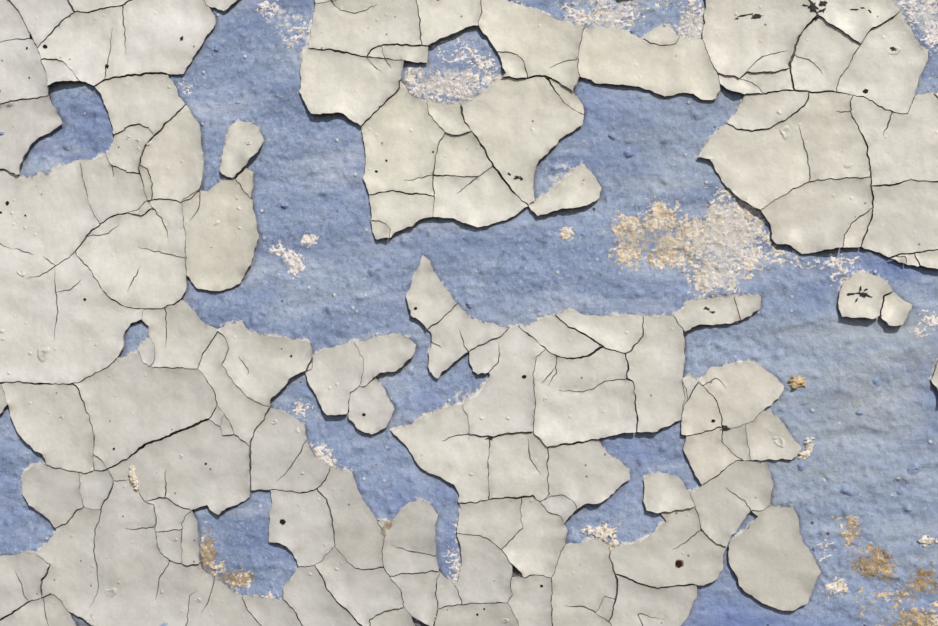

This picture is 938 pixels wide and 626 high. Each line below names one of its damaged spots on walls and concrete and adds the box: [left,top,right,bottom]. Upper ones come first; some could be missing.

crack [2,0,169,104]
crack [309,0,439,126]
crack [499,28,585,115]
crack [703,3,938,248]
crack [889,249,938,267]
crack [0,102,696,626]
crack [660,378,771,550]